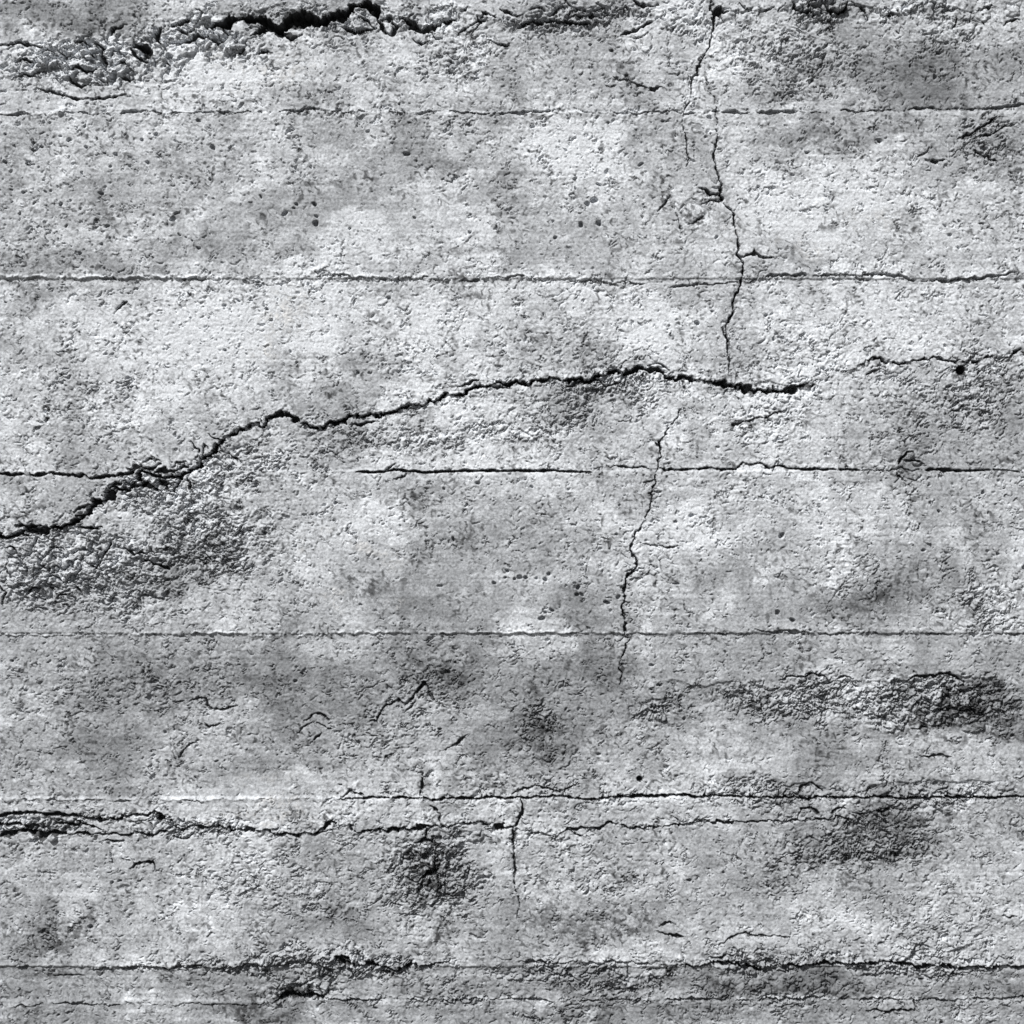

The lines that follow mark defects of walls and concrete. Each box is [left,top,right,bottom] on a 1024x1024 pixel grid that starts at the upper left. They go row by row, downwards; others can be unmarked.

crack [0,0,1024,693]
crack [67,771,1020,921]
crack [335,955,446,976]
crack [684,954,1022,971]
crack [865,995,919,1014]